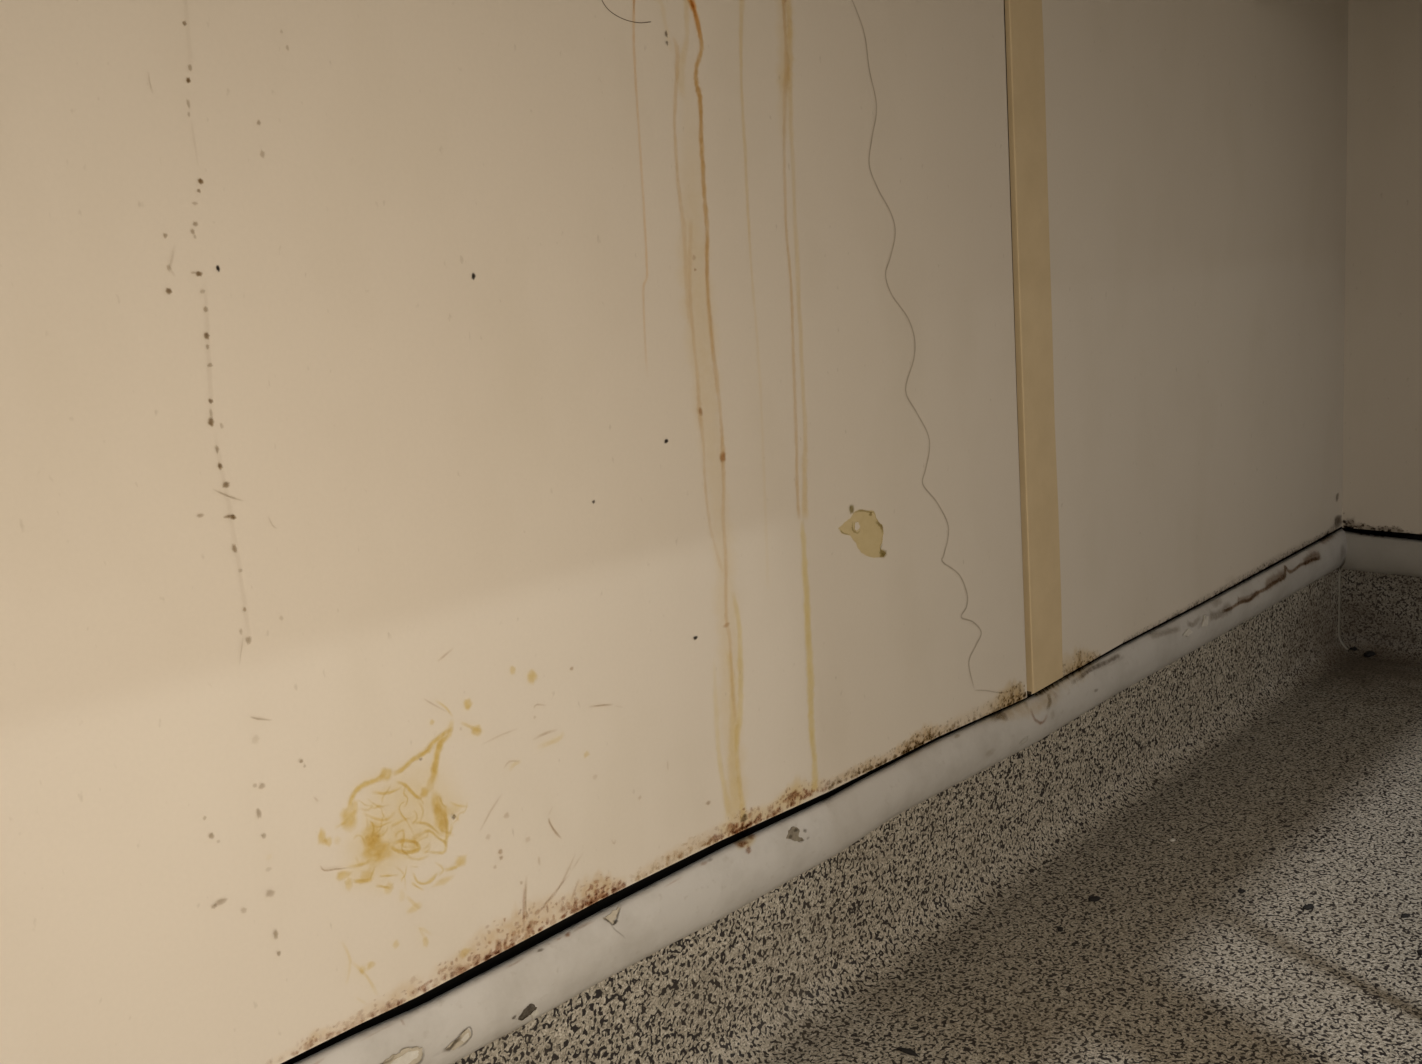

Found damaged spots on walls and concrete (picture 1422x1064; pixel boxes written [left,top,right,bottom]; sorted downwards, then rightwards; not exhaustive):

peeling [446,1028,471,1050]
peeling [382,1046,423,1064]